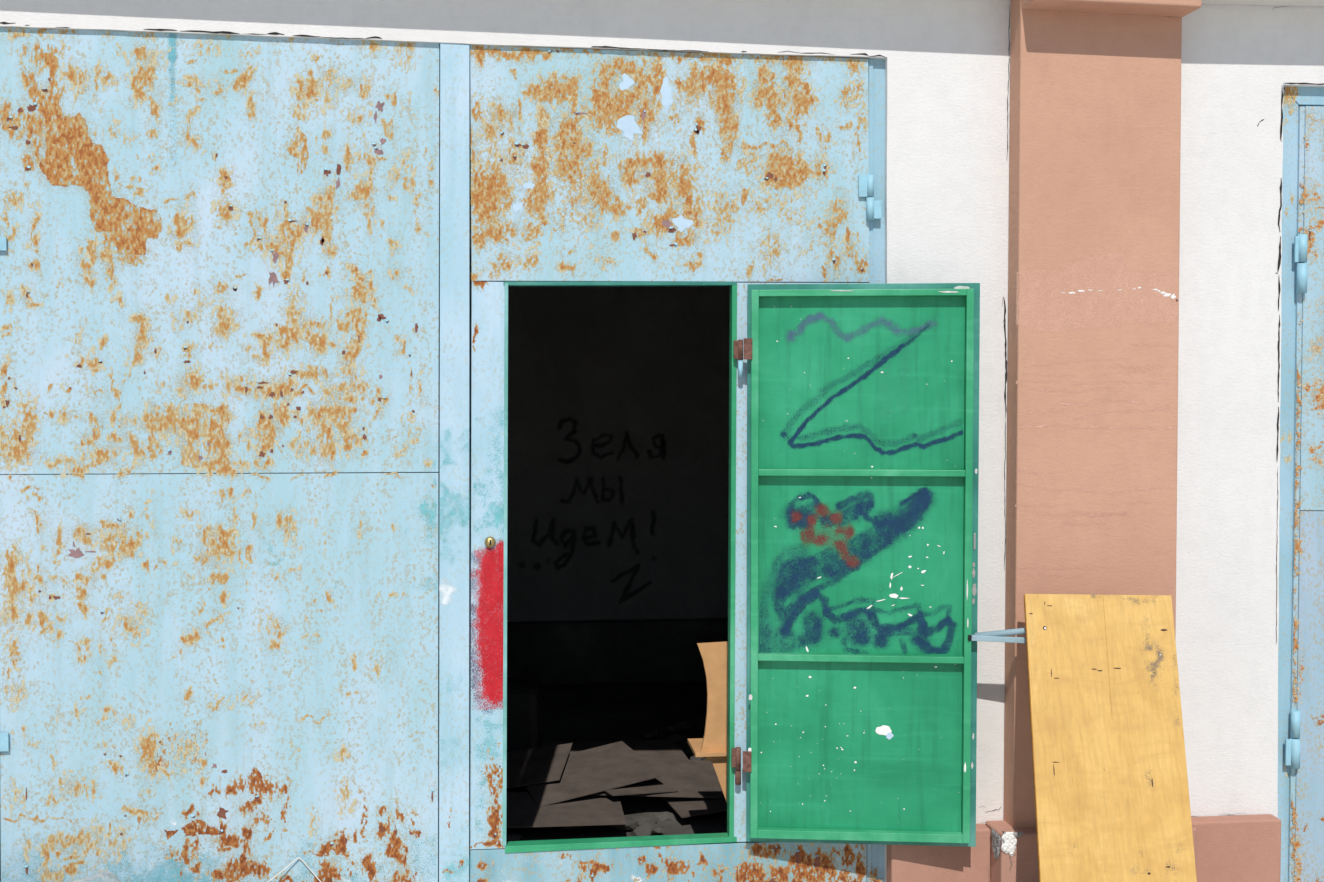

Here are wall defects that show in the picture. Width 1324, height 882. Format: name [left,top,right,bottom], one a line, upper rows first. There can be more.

corrosion [1283,86,1324,263]
corrosion [0,27,436,882]
corrosion [1280,287,1324,706]
corrosion [442,743,504,882]
corrosion [559,843,883,882]
corrosion [1280,734,1324,882]